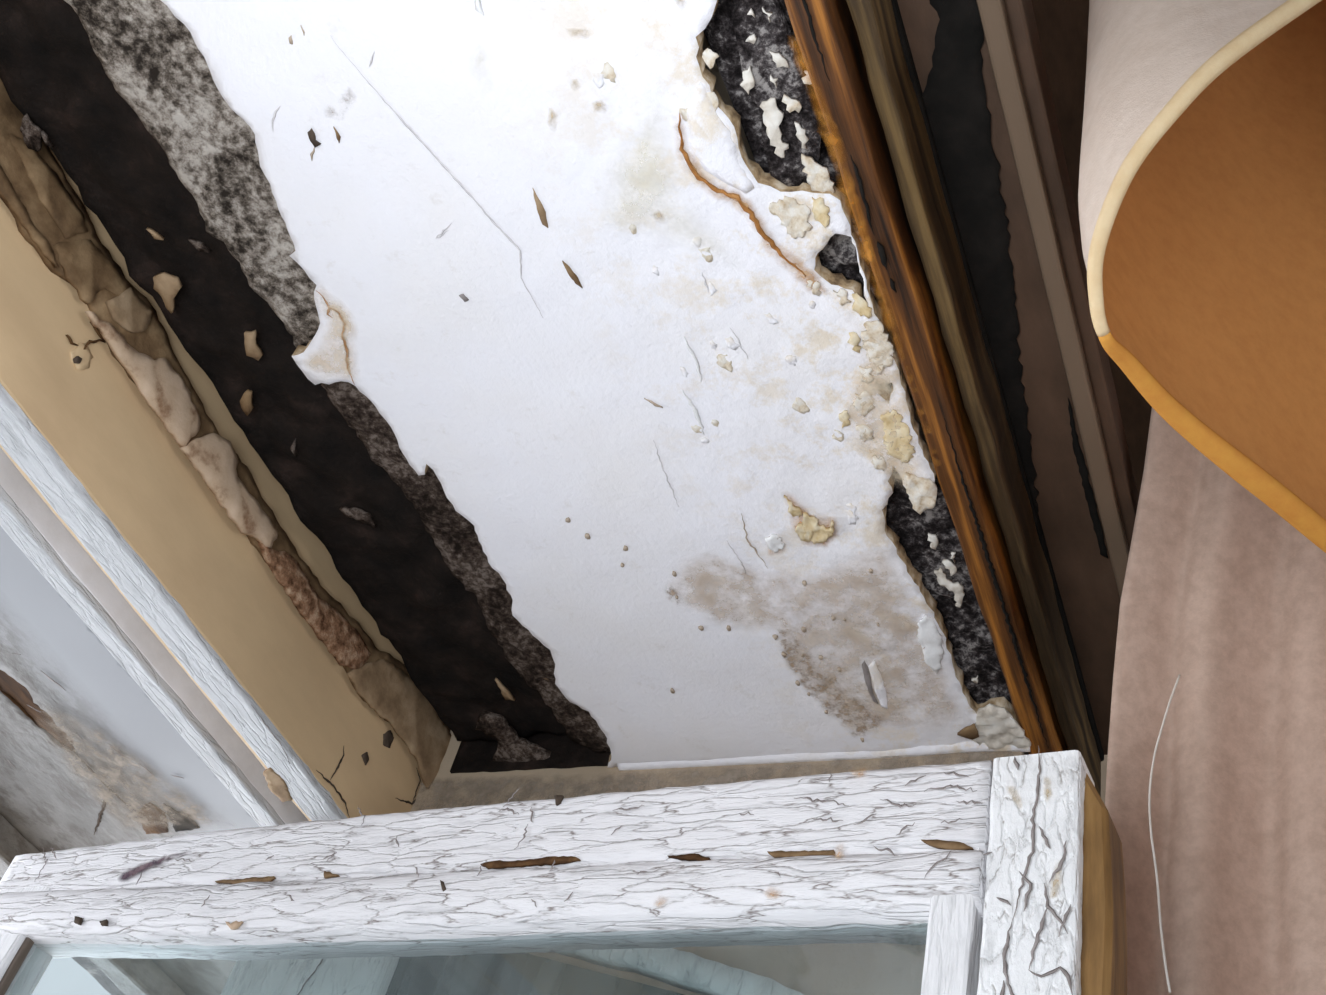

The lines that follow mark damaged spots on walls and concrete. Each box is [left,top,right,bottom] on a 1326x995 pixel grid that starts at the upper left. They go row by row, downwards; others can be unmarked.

spalling [0,0,611,789]
spalling [678,0,1039,752]
crack [35,847,57,880]
peeling [0,670,168,834]
crack [499,788,534,849]
crack [611,805,644,835]
water stain [668,571,765,631]
water stain [772,568,931,742]
crack [794,772,981,879]
crack [944,418,1073,995]